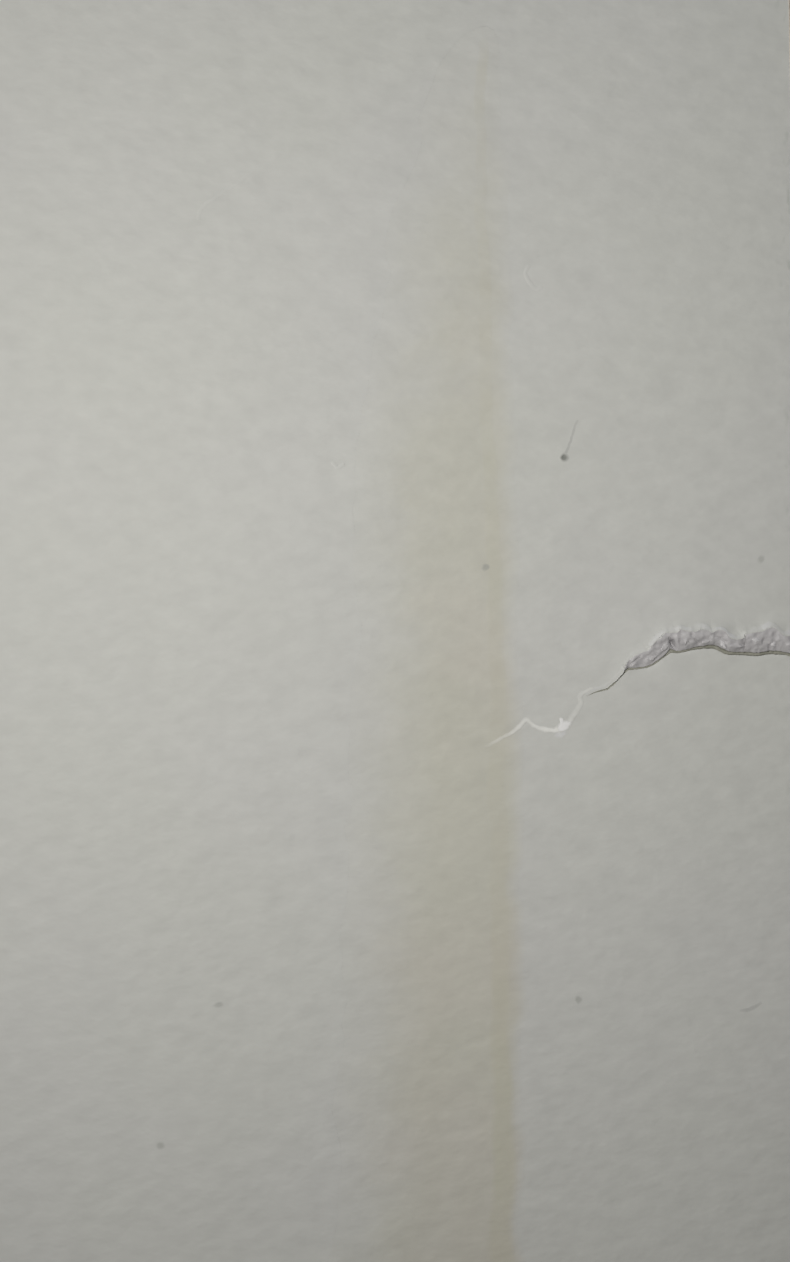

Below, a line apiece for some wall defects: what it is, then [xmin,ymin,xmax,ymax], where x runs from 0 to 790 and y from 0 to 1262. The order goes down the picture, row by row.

crack [483,620,790,749]